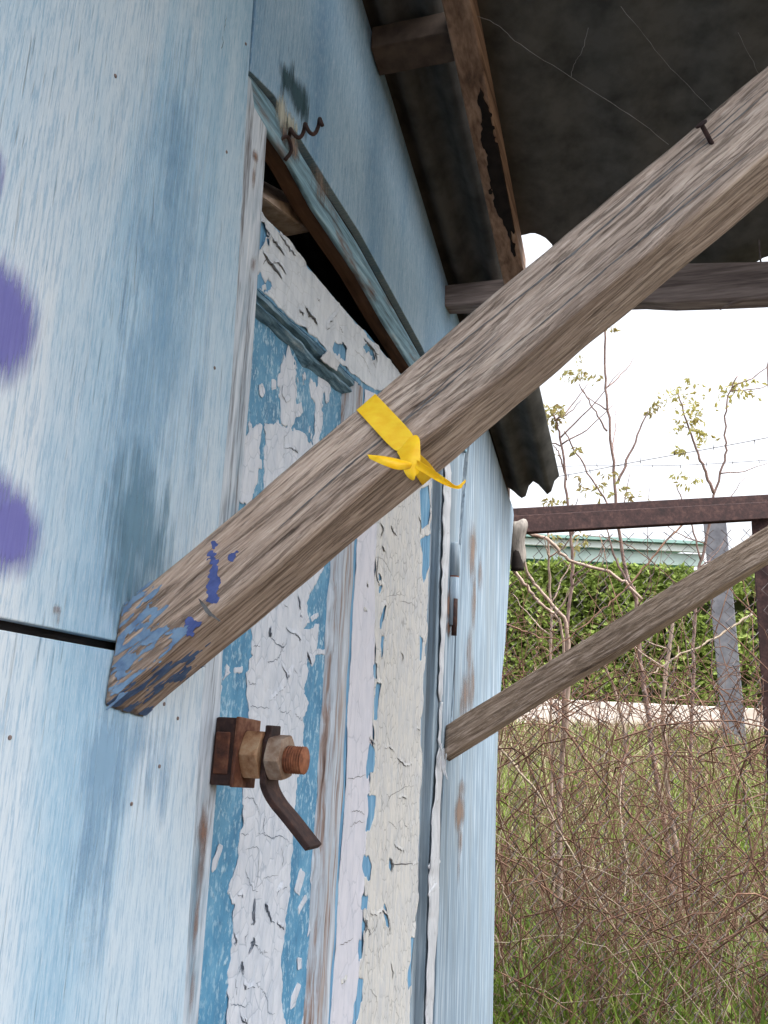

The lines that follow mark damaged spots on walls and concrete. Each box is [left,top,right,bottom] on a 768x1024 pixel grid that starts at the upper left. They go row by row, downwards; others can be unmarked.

peeling [258,212,401,403]
peeling [240,345,331,505]
peeling [211,844,223,873]
crack [231,796,289,1024]
peeling [226,774,312,1024]
peeling [221,567,325,747]
crack [248,594,313,721]
crack [340,907,391,945]
peeling [330,463,451,1024]
crack [369,736,419,871]